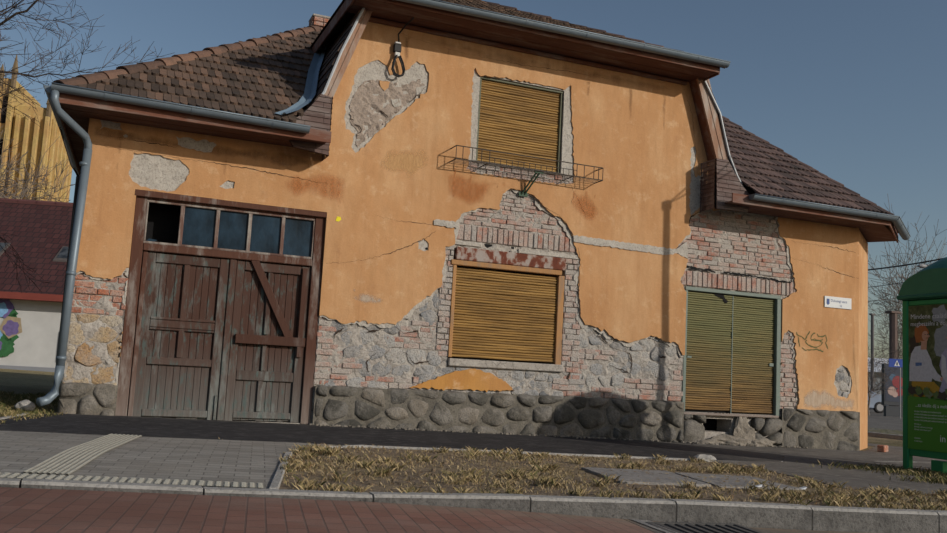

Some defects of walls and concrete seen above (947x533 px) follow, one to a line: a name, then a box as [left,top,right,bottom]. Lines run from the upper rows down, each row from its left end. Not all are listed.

peeling [129,153,189,192]
crack [326,215,435,264]
spalling [312,60,683,405]
spalling [677,147,796,303]
spalling [62,268,129,385]
spalling [834,365,852,398]